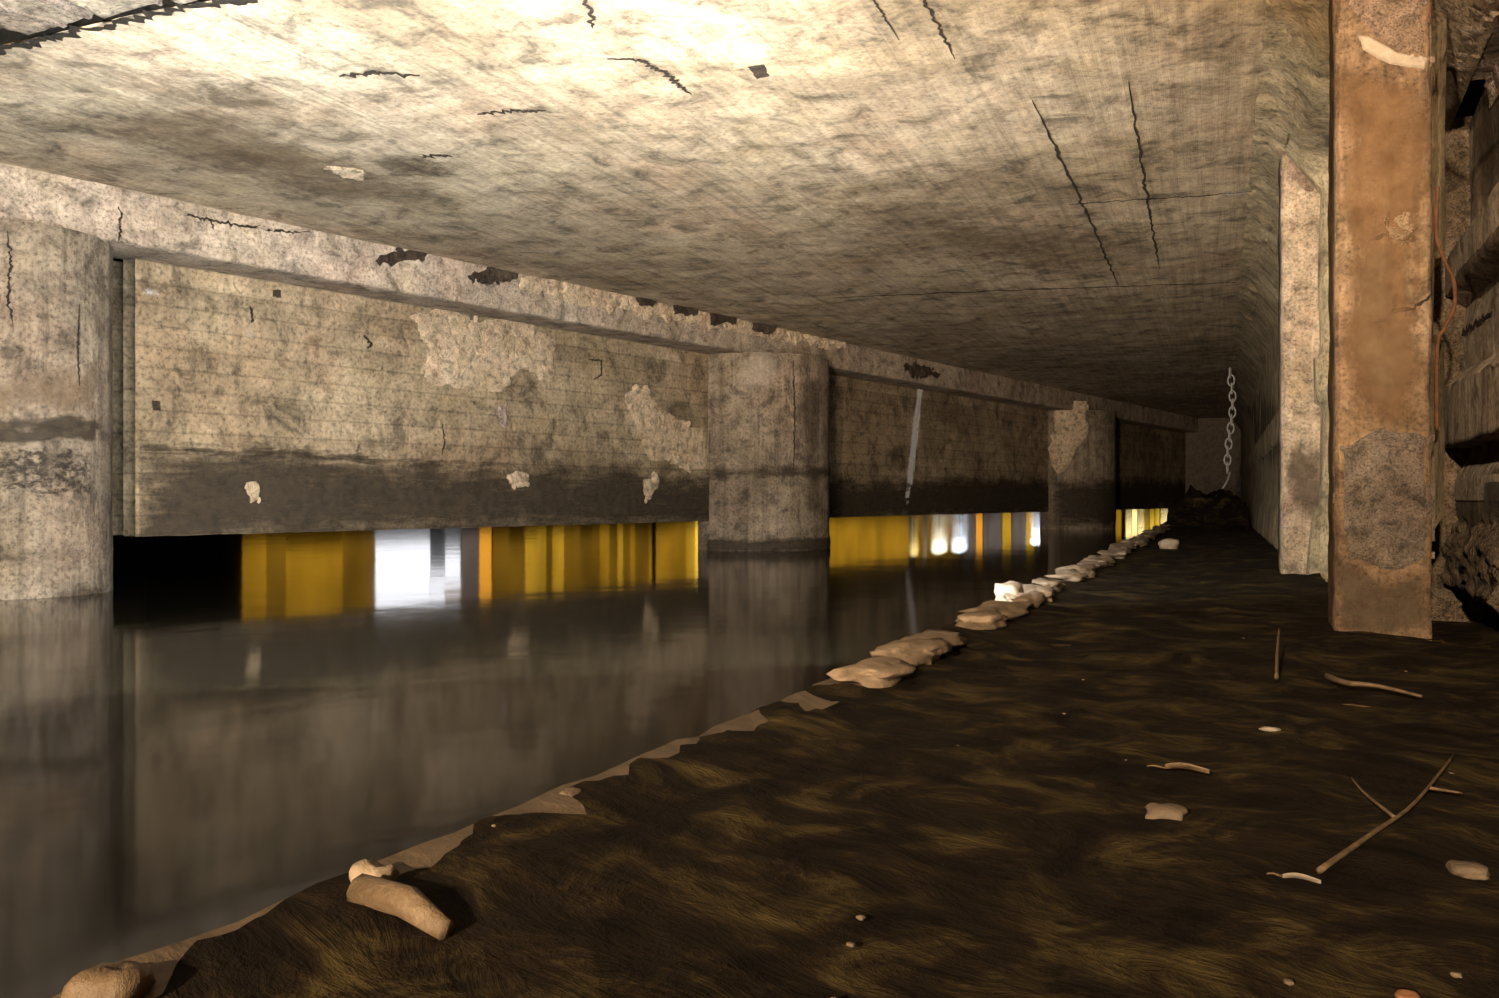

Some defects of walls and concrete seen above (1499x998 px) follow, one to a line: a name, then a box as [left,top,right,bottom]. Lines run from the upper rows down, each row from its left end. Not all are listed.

spalling [38,0,93,28]
spalling [1348,0,1435,69]
peeling [1483,11,1499,22]
peeling [410,308,556,428]
peeling [1333,187,1499,570]
spalling [625,384,705,503]
spalling [1048,401,1089,474]
damp [142,450,733,536]
damp [707,536,831,551]